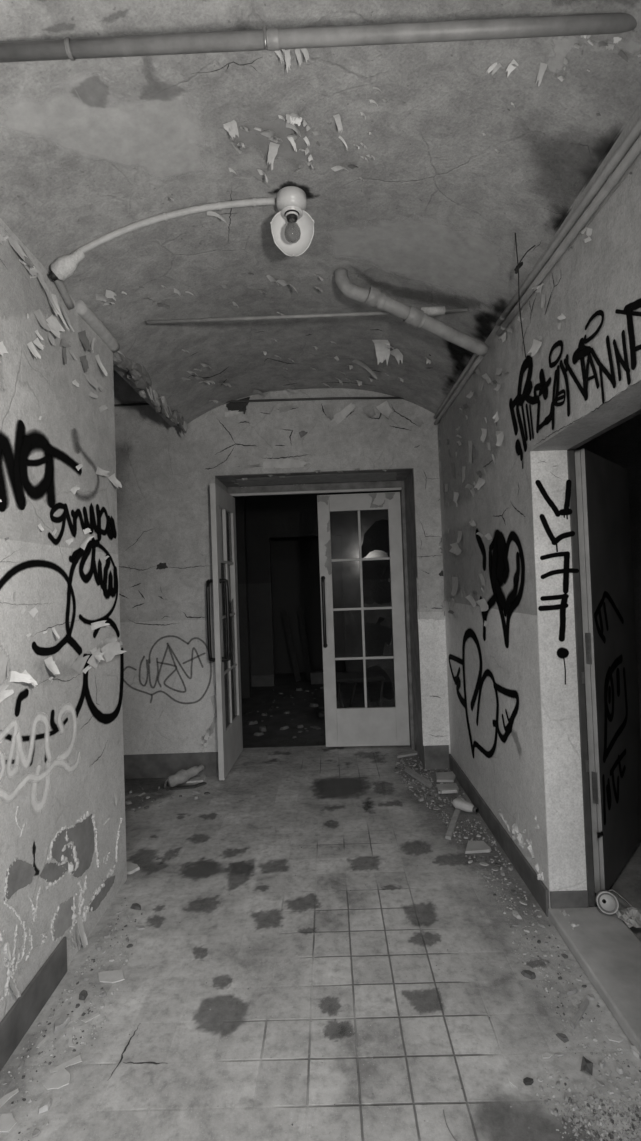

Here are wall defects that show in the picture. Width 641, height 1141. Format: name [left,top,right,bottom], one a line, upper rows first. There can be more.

peeling [486,59,519,78]
peeling [223,113,323,182]
peeling [331,87,388,181]
water stain [553,212,569,230]
spalling [0,235,193,436]
crack [206,331,440,501]
peeling [437,367,509,507]
spalling [0,793,123,1003]
water stain [131,836,287,891]
water stain [252,894,317,929]
water stain [195,976,247,1033]
water stain [321,998,354,1039]